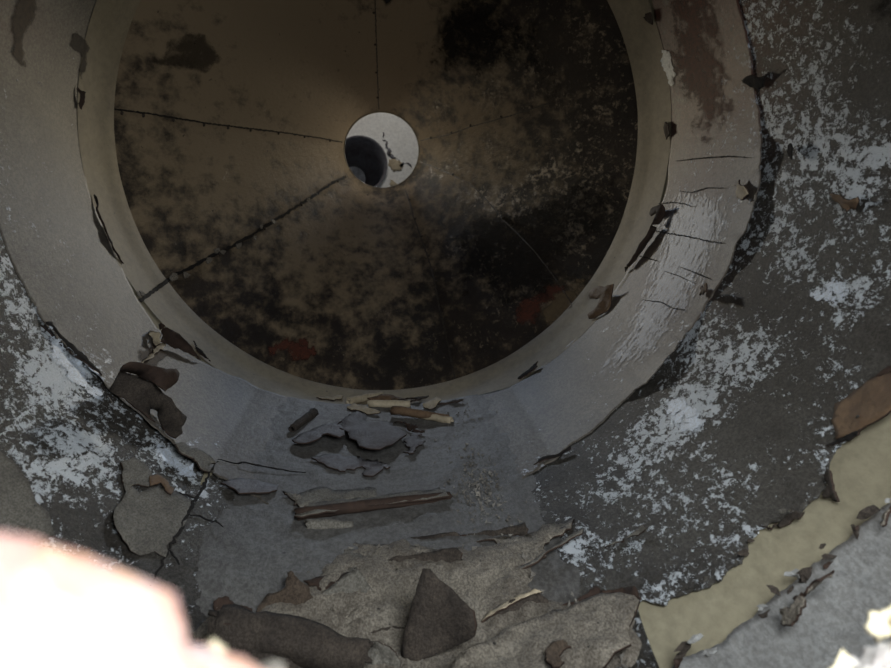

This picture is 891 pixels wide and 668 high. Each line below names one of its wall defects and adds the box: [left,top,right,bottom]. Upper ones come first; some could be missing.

crack [639,256,711,283]
crack [658,187,723,207]
crack [657,231,726,244]
crack [677,154,751,162]
peeling [109,323,201,439]
peeling [826,366,891,447]
peeling [0,451,54,542]
peeling [113,457,191,558]
crack [151,459,306,584]
peeling [820,458,840,502]
peeling [671,498,891,668]
peeling [256,659,286,668]